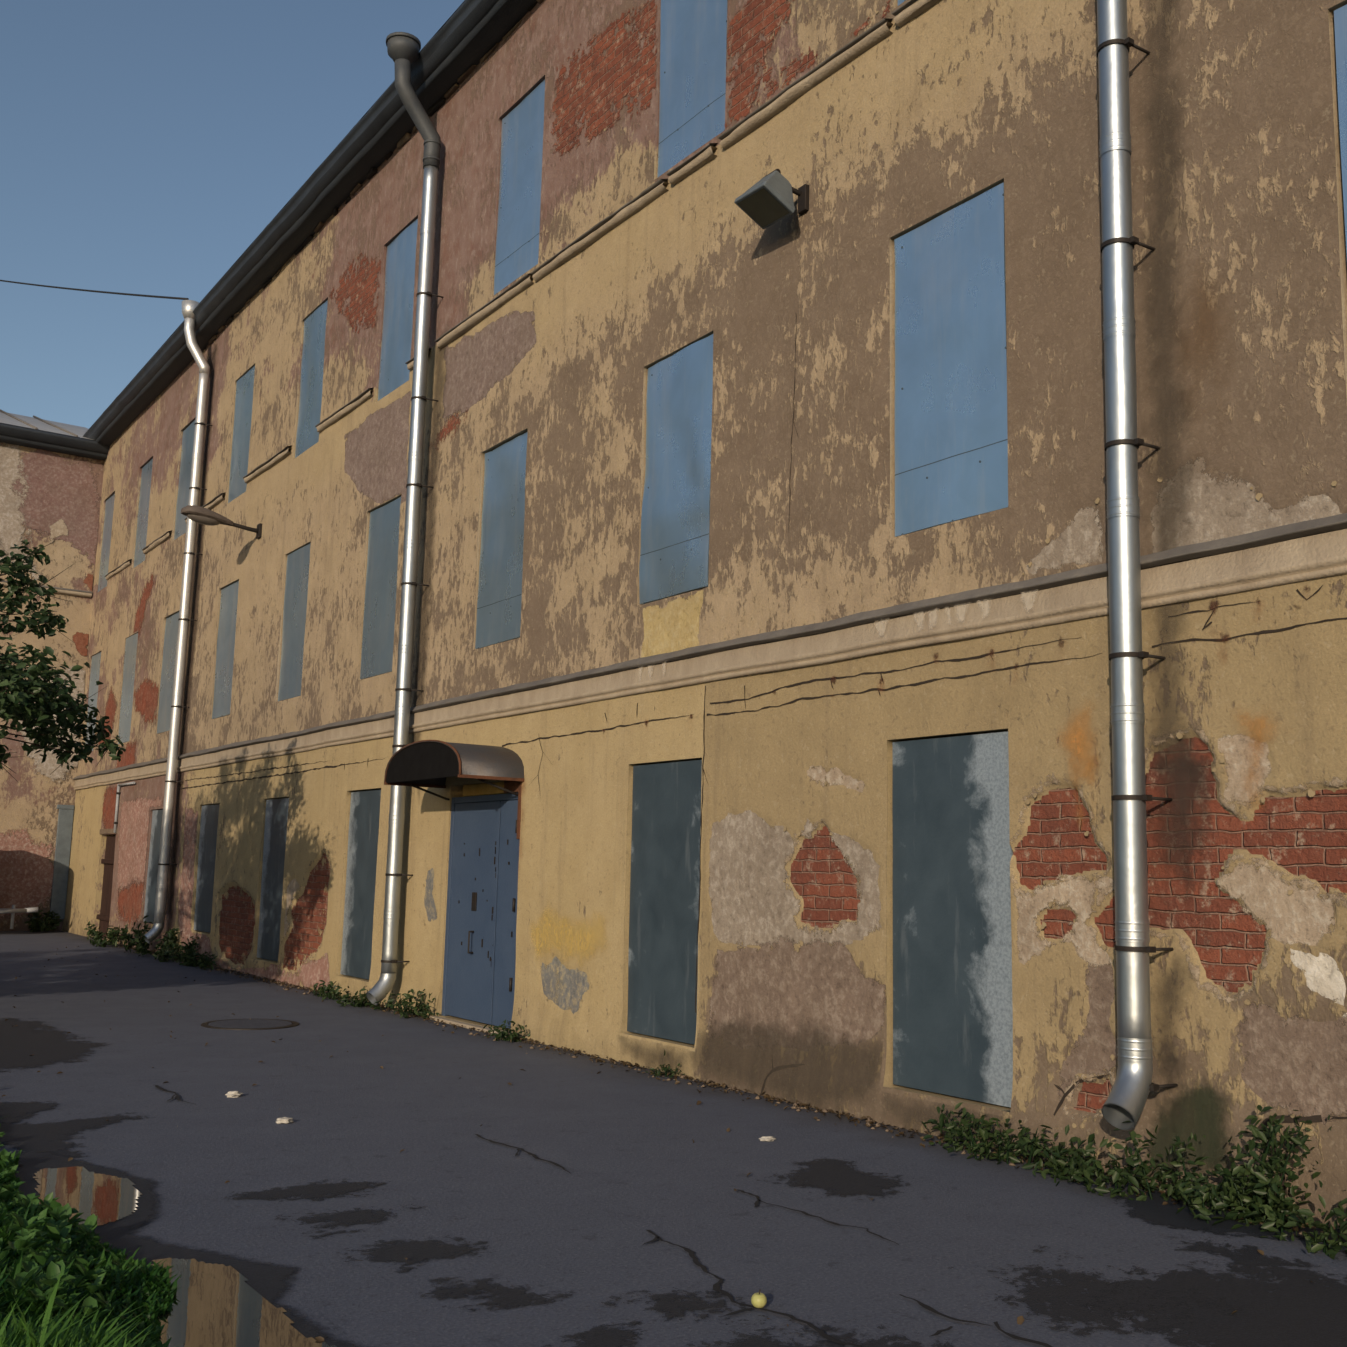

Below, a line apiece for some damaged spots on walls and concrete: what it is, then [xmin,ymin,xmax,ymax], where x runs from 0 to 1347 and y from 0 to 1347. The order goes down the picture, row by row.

spalling [548,0,658,156]
spalling [725,0,818,127]
flaking render [0,443,101,579]
flaking render [1022,498,1103,575]
flaking render [1150,457,1342,556]
flaking render [0,828,55,923]
spalling [178,807,331,989]
flaking render [706,810,886,1049]
crack [502,637,1101,1013]
spalling [1010,774,1118,1128]
spalling [1145,727,1347,1125]
leakage [701,1026,877,1101]